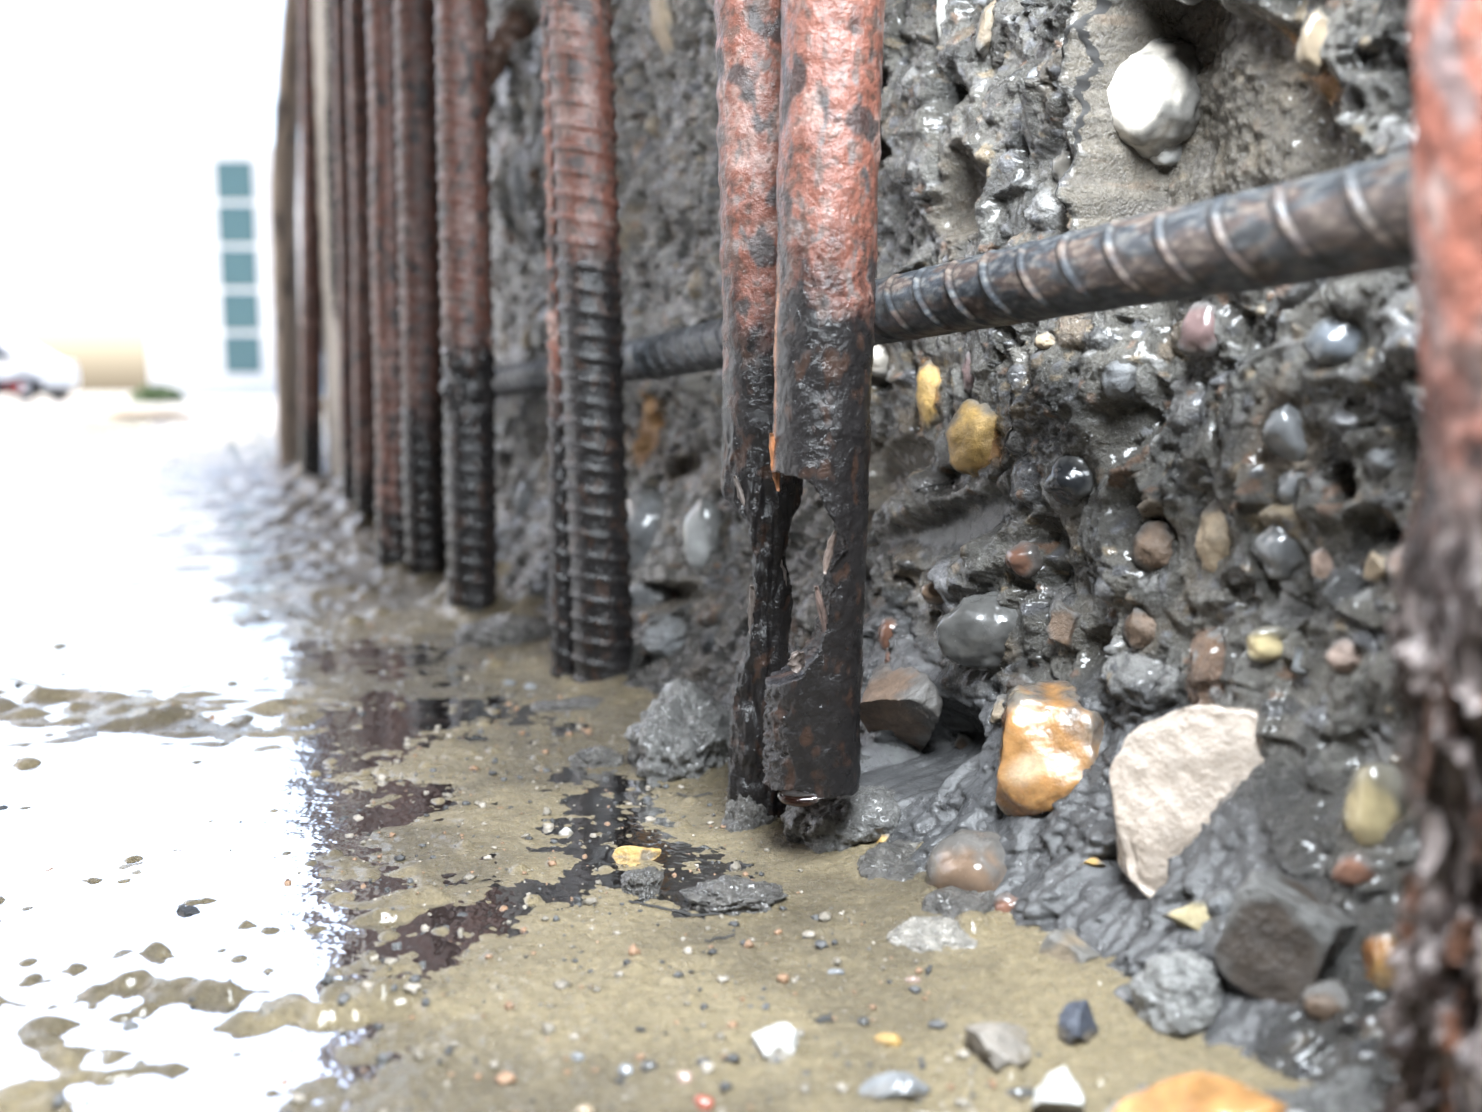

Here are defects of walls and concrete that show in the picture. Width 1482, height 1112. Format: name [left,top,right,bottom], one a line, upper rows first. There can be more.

spalling [270,0,324,477]
spalling [325,0,1482,1112]